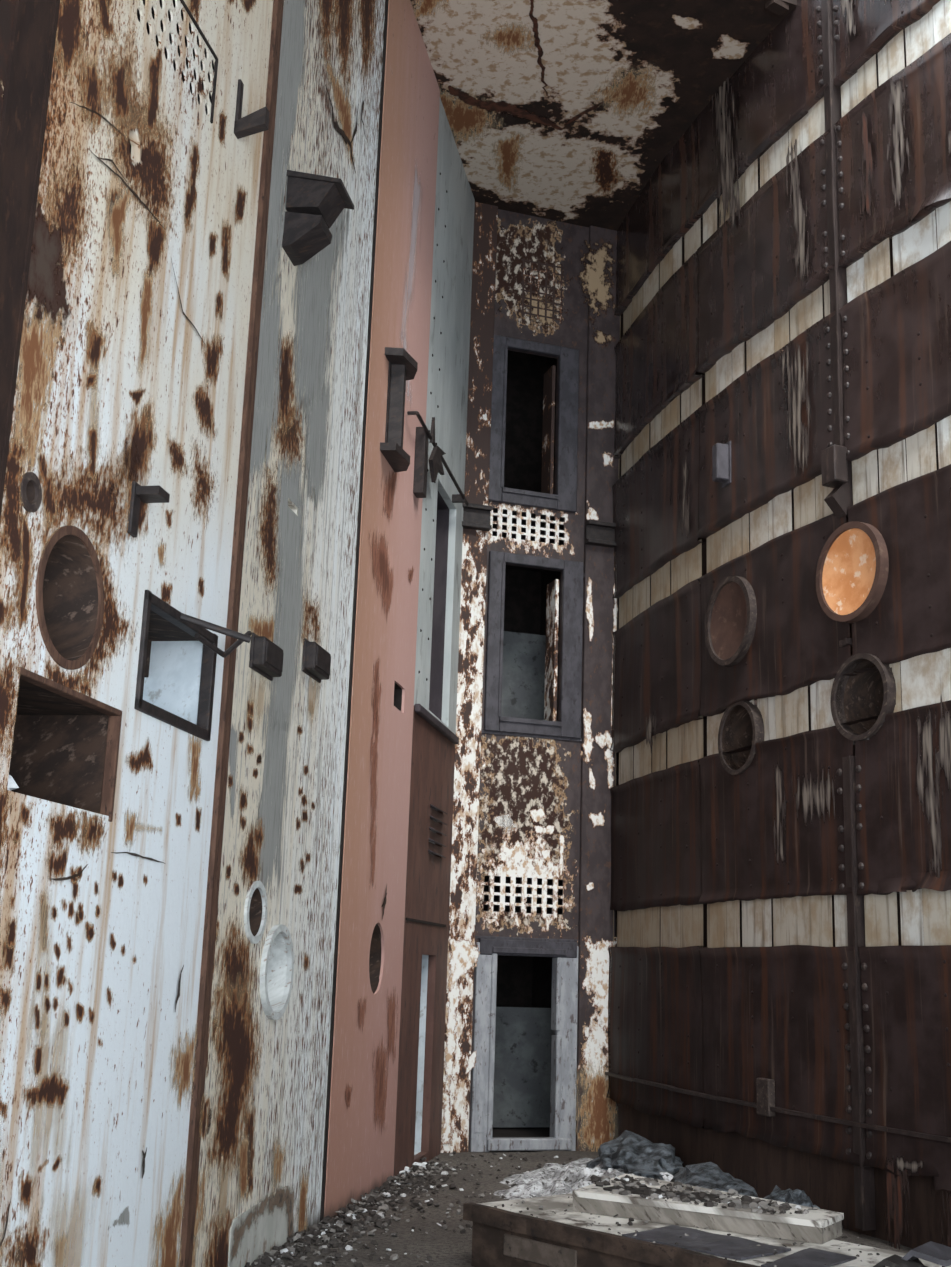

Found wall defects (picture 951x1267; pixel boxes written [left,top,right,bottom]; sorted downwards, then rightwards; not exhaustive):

crack [448,0,603,130]
peeling [711,34,750,59]
corrosion [54,0,200,365]
corrosion [210,188,246,276]
peeling [411,0,680,347]
corrosion [0,146,154,696]
corrosion [169,337,223,518]
peeling [487,500,599,558]
peeling [585,577,594,641]
peeling [579,696,616,789]
corrosion [153,919,261,1267]
corrosion [0,1157,68,1267]